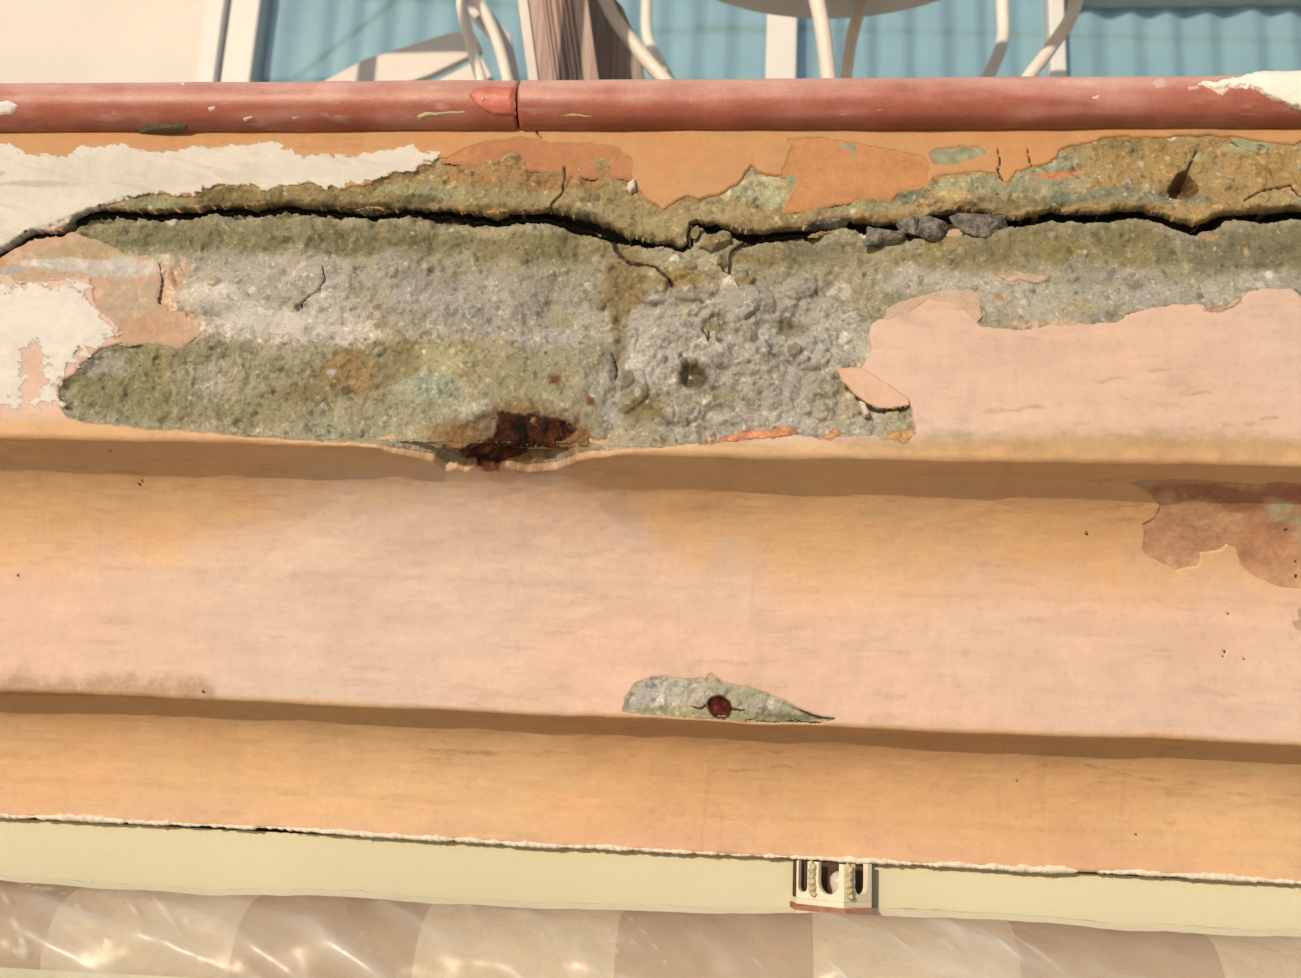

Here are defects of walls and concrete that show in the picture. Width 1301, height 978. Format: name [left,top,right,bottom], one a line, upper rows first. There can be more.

crack [997,149,1032,181]
crack [0,167,912,286]
crack [932,185,1301,237]
crack [301,267,326,309]
spalling [0,136,1301,464]
rust [442,406,583,471]
peeling [1132,479,1301,589]
rust [706,695,732,719]
spalling [623,674,835,723]